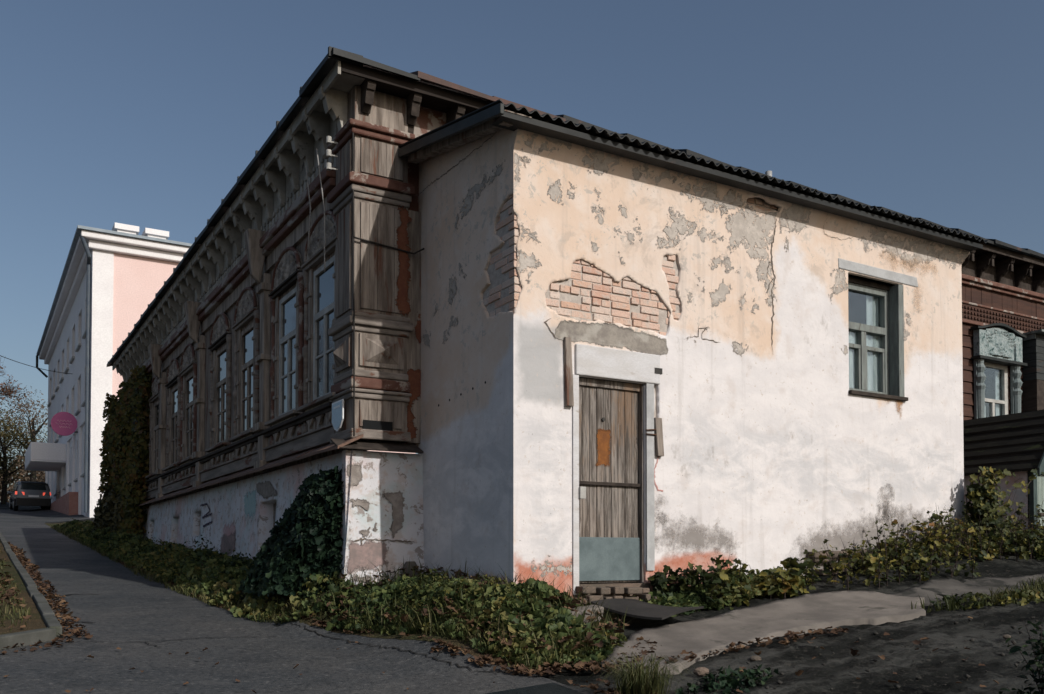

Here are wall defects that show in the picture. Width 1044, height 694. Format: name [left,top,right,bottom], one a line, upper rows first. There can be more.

peeling [395,205,467,347]
flaking render [454,133,811,357]
crack [767,219,777,350]
flaking render [347,463,370,510]
flaking render [347,491,405,583]
flaking render [531,555,573,578]
leakage [655,501,732,550]
leakage [798,487,964,570]